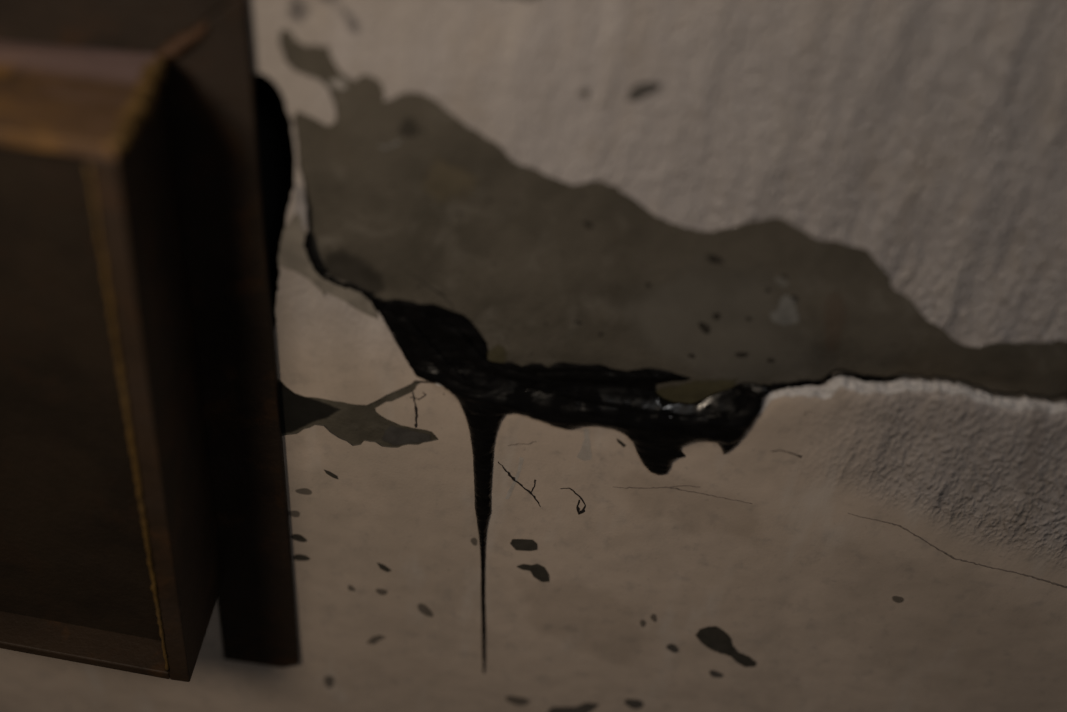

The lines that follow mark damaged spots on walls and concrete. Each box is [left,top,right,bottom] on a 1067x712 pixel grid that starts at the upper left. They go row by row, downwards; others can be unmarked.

spalling [278,30,1067,404]
peeling [278,379,438,447]
leakage [303,233,909,673]